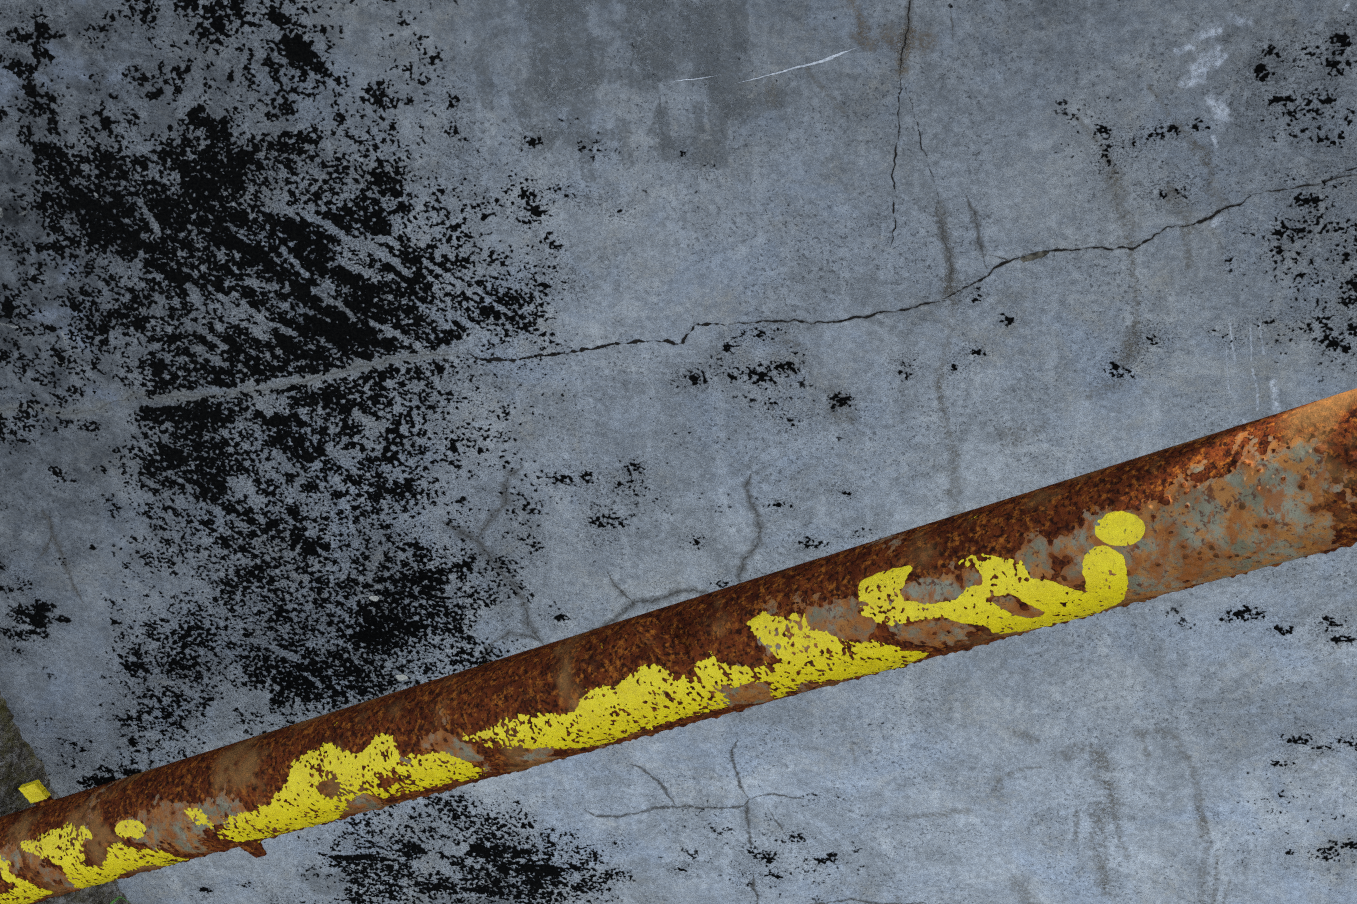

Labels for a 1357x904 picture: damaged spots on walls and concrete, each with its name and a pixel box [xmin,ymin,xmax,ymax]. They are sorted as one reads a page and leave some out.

crack [368,0,1357,368]
crack [451,471,544,645]
crack [605,586,705,625]
rust [239,842,267,858]